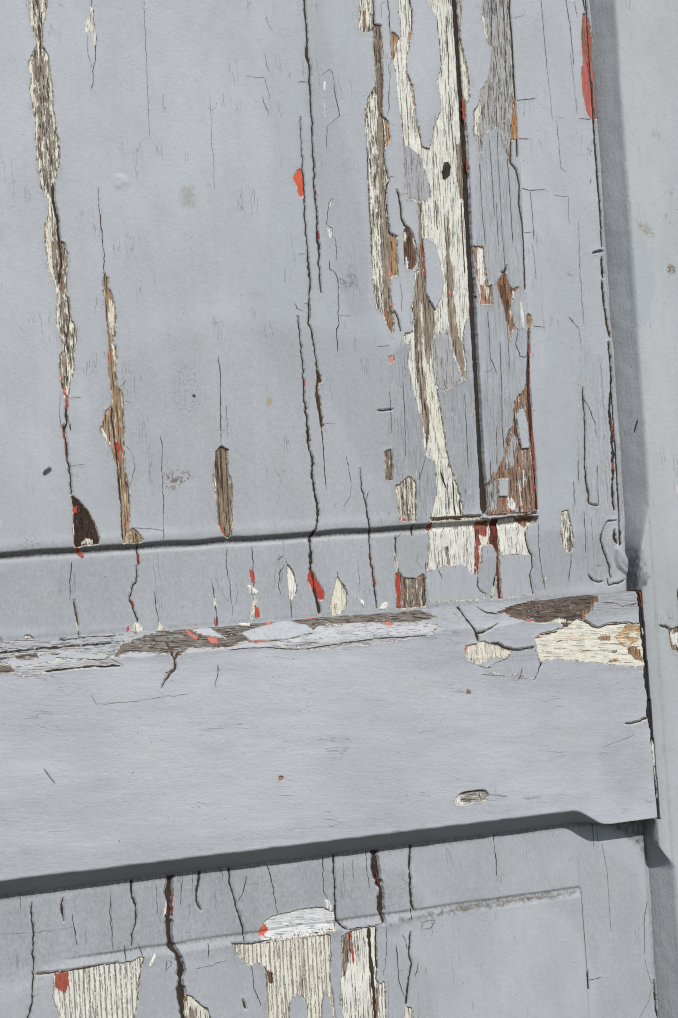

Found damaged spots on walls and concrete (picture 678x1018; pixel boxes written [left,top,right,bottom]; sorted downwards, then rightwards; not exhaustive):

peeling [0,0,644,680]
crack [295,0,351,613]
crack [343,0,658,799]
peeling [659,625,678,653]
crack [9,893,87,1018]
peeling [37,954,155,1018]
crack [109,865,278,1018]
peeling [183,993,210,1018]
peeling [232,900,385,1018]
peeling [396,933,418,1018]